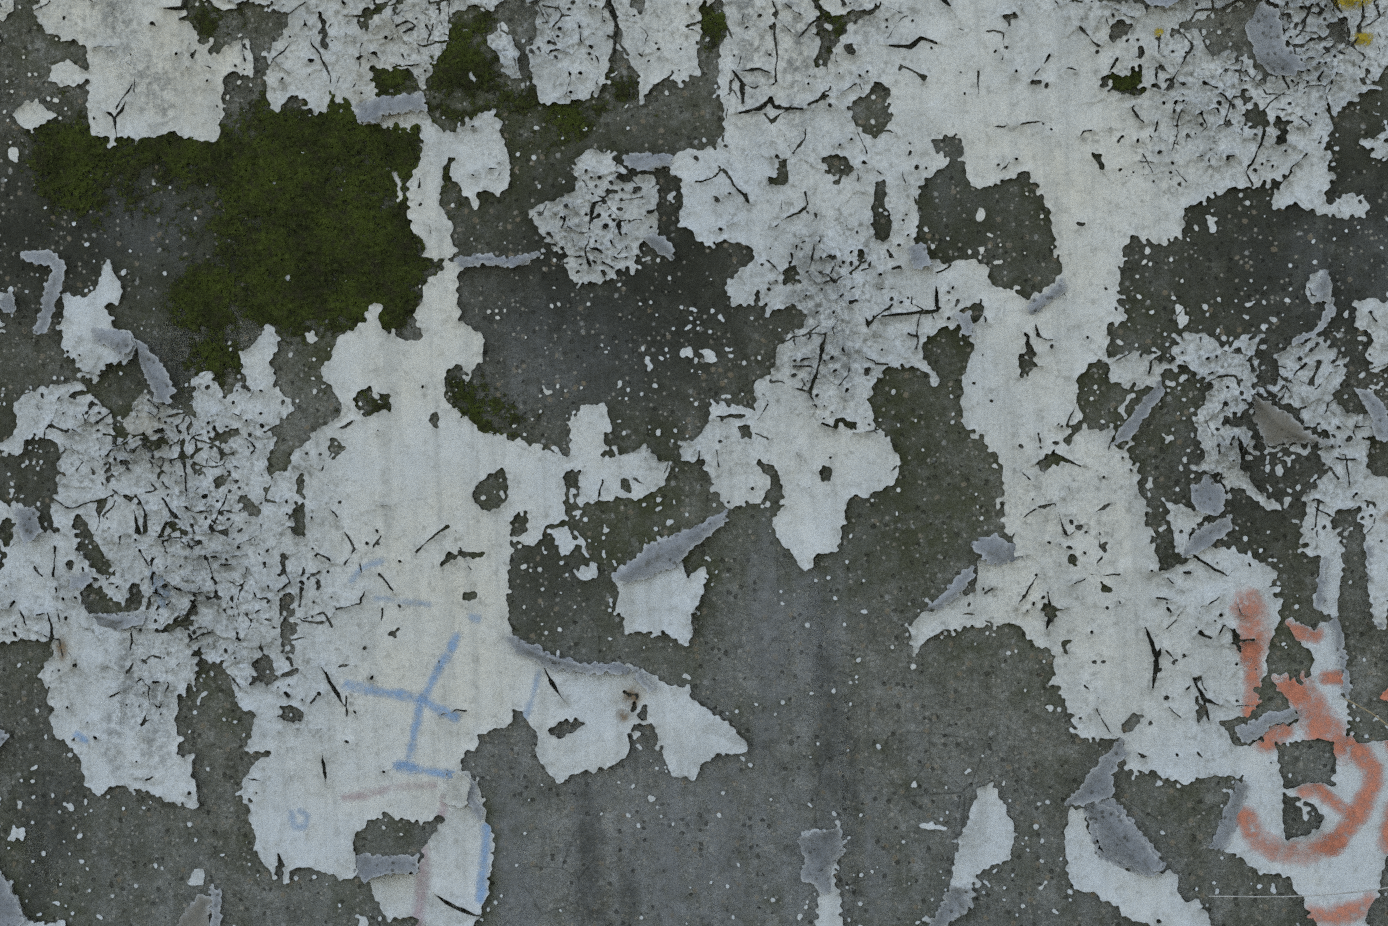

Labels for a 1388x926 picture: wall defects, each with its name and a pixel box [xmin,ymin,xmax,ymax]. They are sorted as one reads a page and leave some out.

crack [169,0,188,11]
crack [733,68,804,114]
crack [889,37,938,50]
peeling [0,0,369,569]
peeling [236,0,1317,926]
peeling [1038,0,1388,839]
peeling [68,497,146,632]
crack [157,605,197,633]
peeling [0,606,445,926]
peeling [1365,856,1388,926]